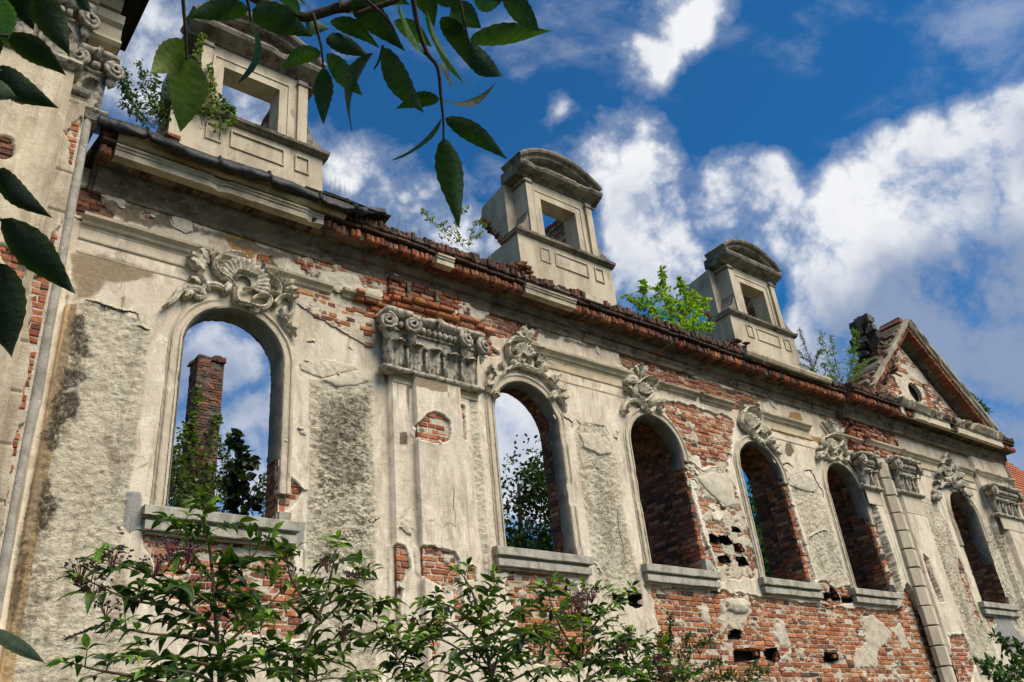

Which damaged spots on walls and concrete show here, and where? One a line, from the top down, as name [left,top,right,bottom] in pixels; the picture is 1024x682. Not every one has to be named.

spalling [0,245,52,553]
damp [15,254,152,584]
spalling [285,256,399,348]
spalling [411,413,449,443]
spalling [394,518,478,664]
spalling [612,354,941,682]